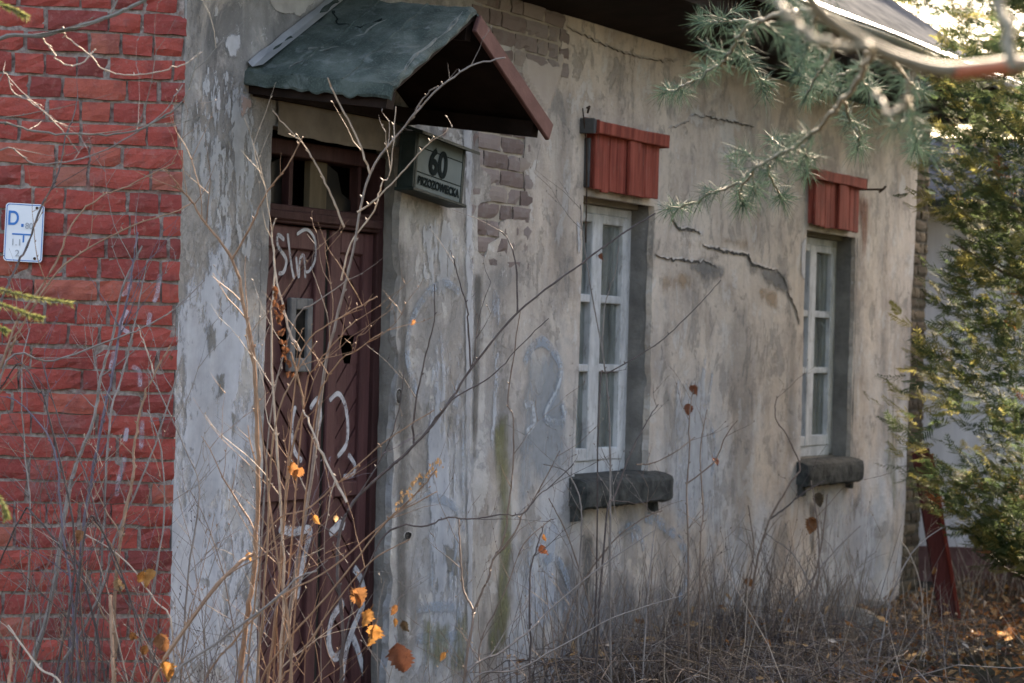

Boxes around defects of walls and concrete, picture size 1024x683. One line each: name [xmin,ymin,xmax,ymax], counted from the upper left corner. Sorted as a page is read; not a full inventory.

flaking render [472,0,570,87]
crack [668,112,755,129]
crack [656,219,800,325]
flaking render [420,130,533,683]